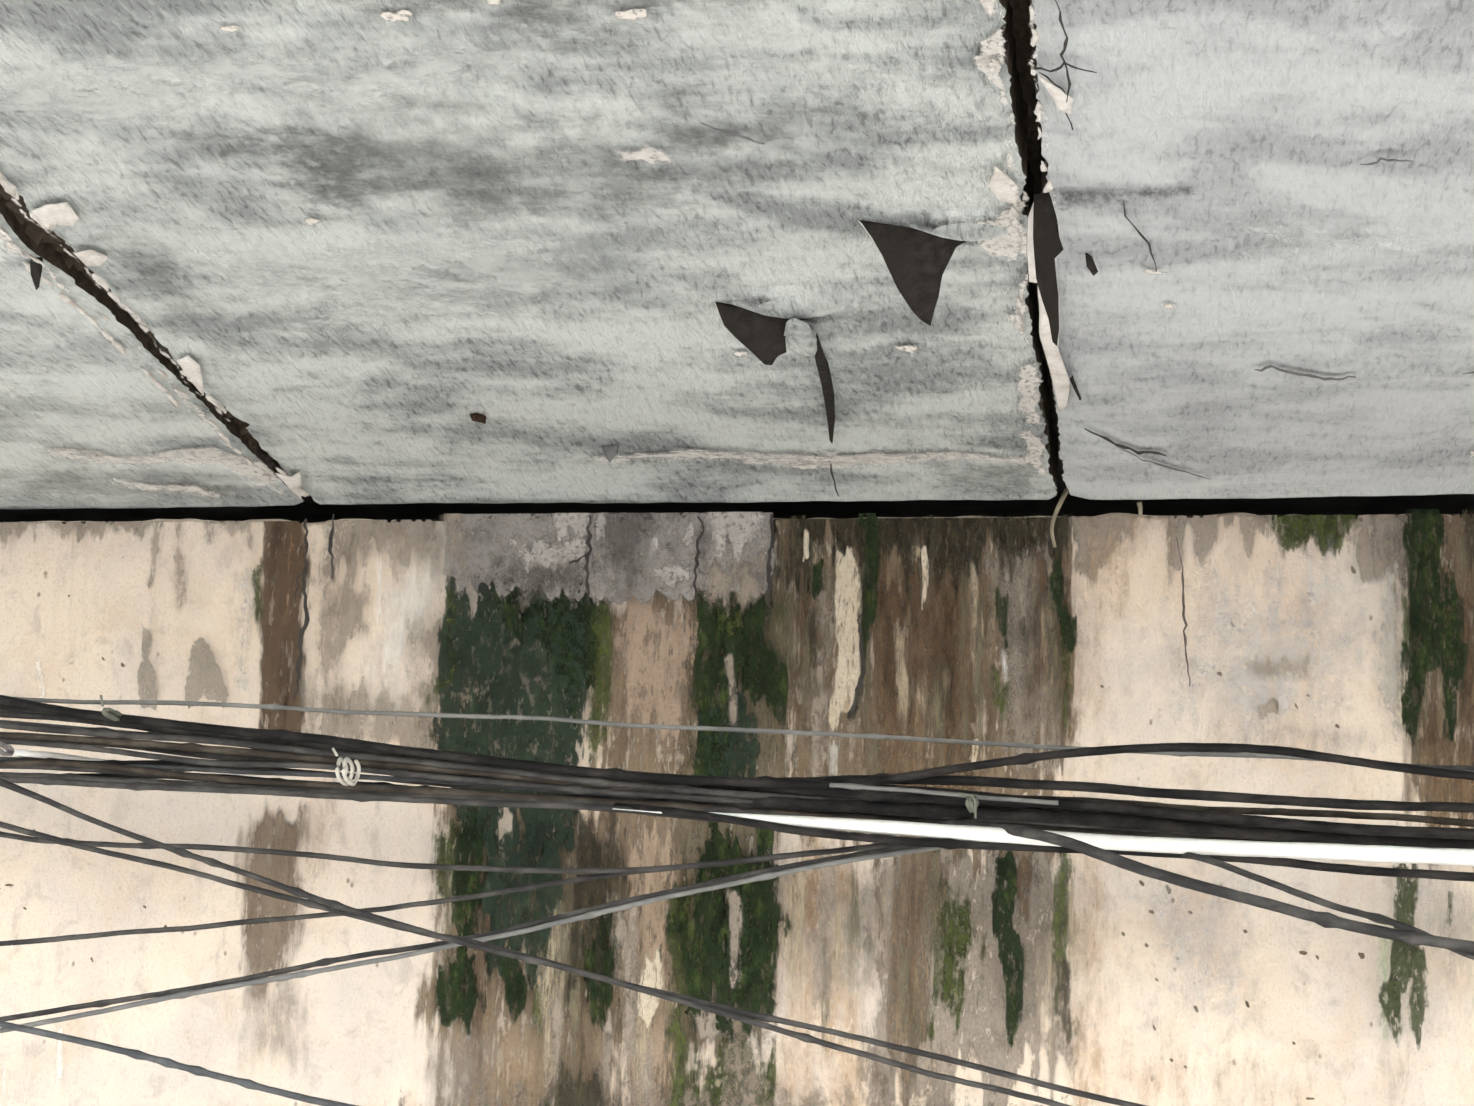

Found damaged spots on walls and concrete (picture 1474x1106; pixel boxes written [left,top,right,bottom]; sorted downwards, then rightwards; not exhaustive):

peeling [593,0,1081,476]
crack [1034,0,1097,130]
peeling [1085,252,1098,276]
crack [1123,202,1157,272]
crack [1084,428,1209,479]
crack [1255,365,1356,381]
crack [1360,157,1413,165]
leakage [185,519,441,749]
leakage [590,514,1149,796]
leakage [1167,514,1474,828]
leakage [235,806,308,1038]
leakage [415,804,1080,1106]